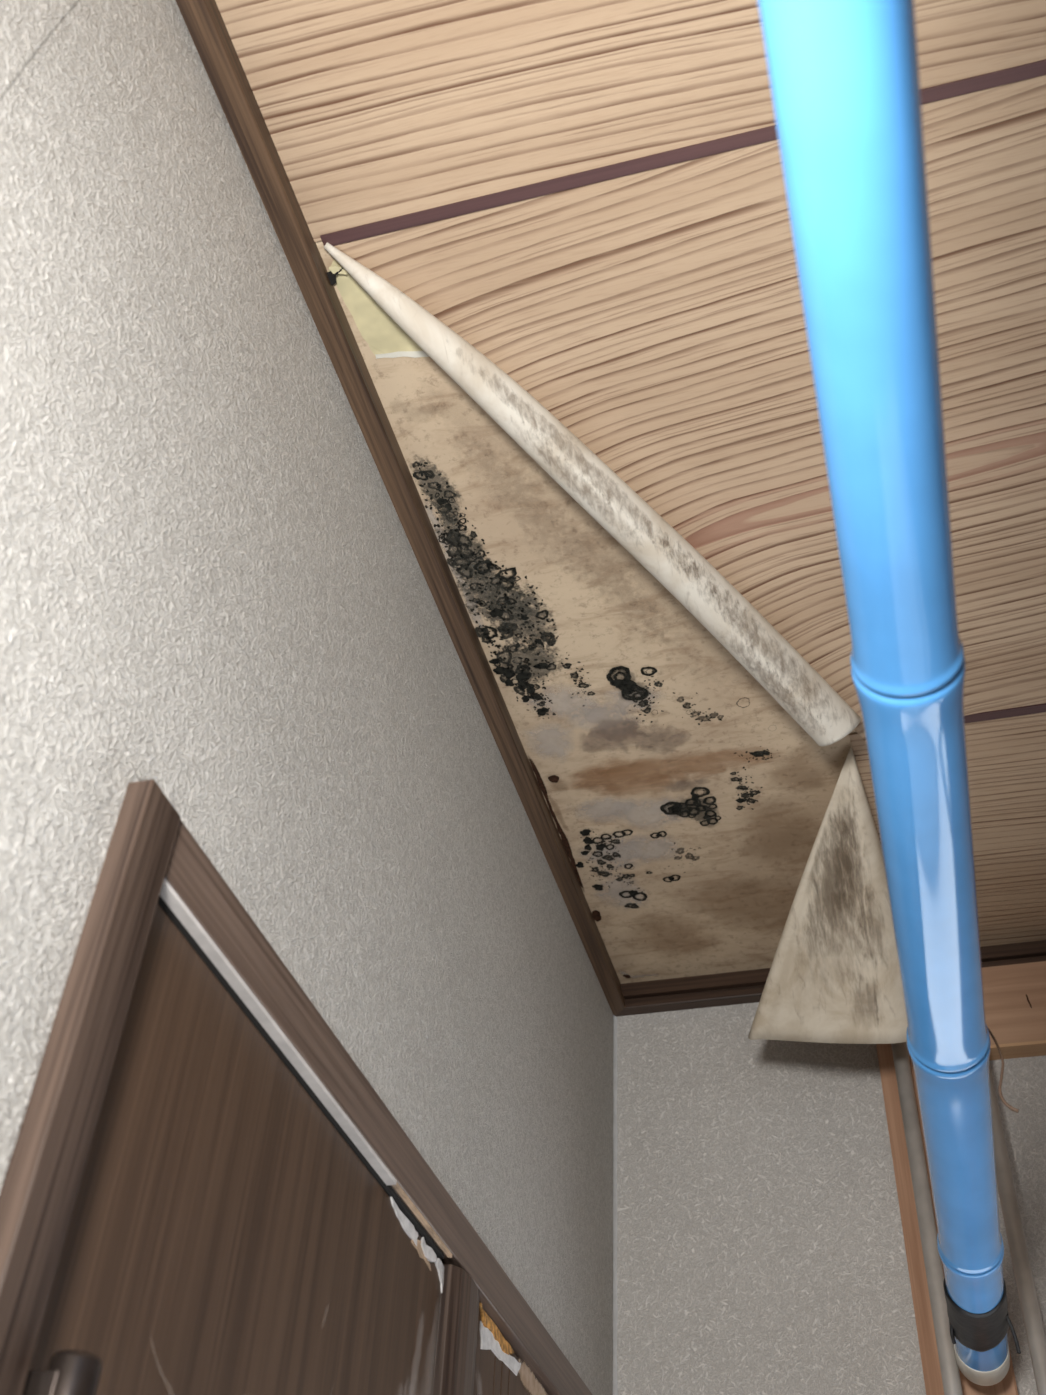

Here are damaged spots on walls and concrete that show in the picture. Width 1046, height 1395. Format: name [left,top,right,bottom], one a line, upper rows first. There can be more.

water stain [412,458,783,909]
peeling [324,242,908,1044]